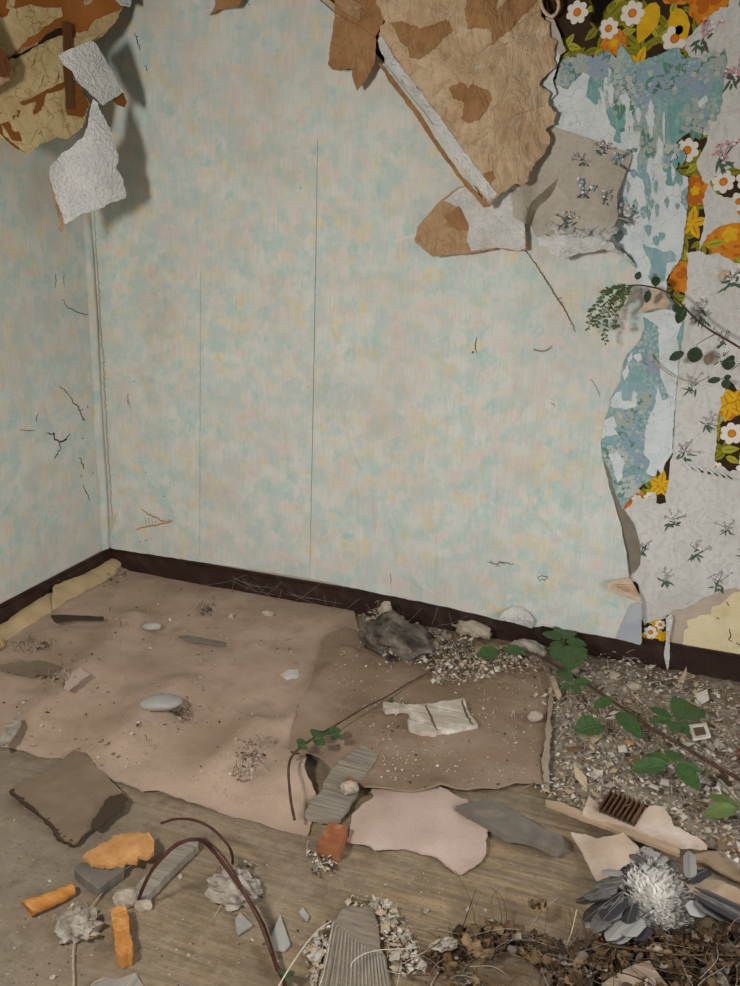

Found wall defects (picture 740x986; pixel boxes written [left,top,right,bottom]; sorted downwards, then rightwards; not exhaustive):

peeling [548,68,689,477]
crack [24,386,90,500]
peeling [609,451,625,483]
flaking render [682,592,740,654]